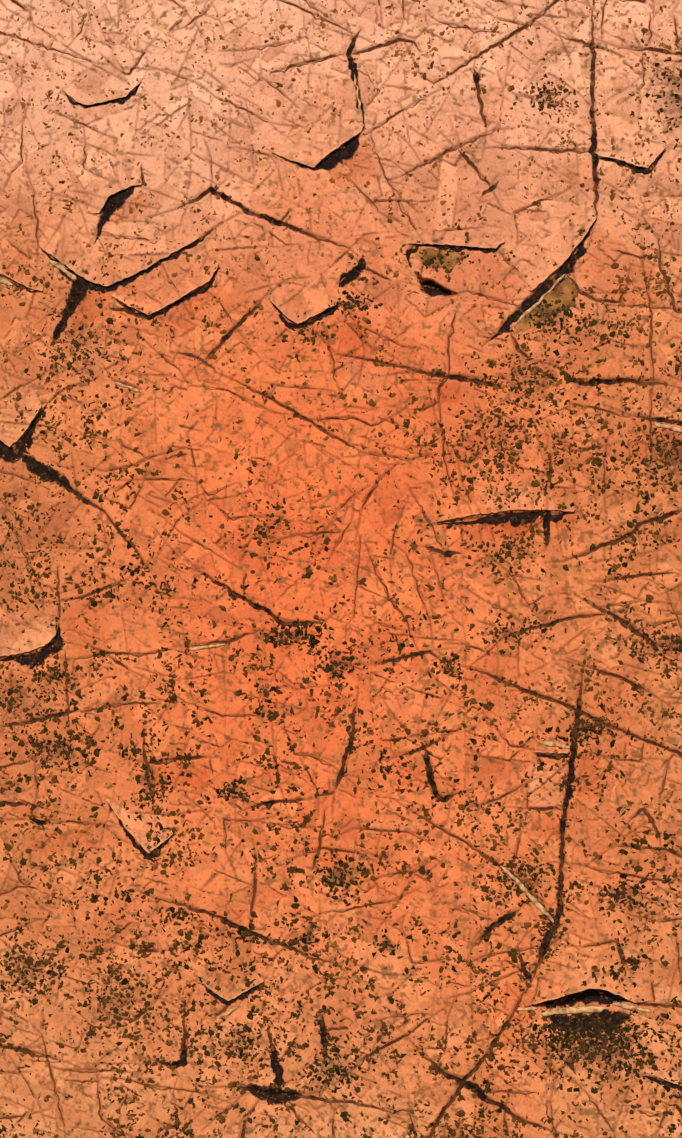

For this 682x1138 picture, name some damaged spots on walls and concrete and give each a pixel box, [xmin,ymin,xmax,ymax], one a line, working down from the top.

peeling [255,30,420,171]
crack [355,0,682,230]
peeling [40,156,220,343]
crack [179,165,348,248]
peeling [270,255,389,329]
spalling [418,278,451,297]
peeling [486,204,597,343]
crack [556,241,682,449]
crack [162,258,521,665]
peeling [0,570,70,720]
crack [215,646,682,1138]
crack [0,1017,200,1131]